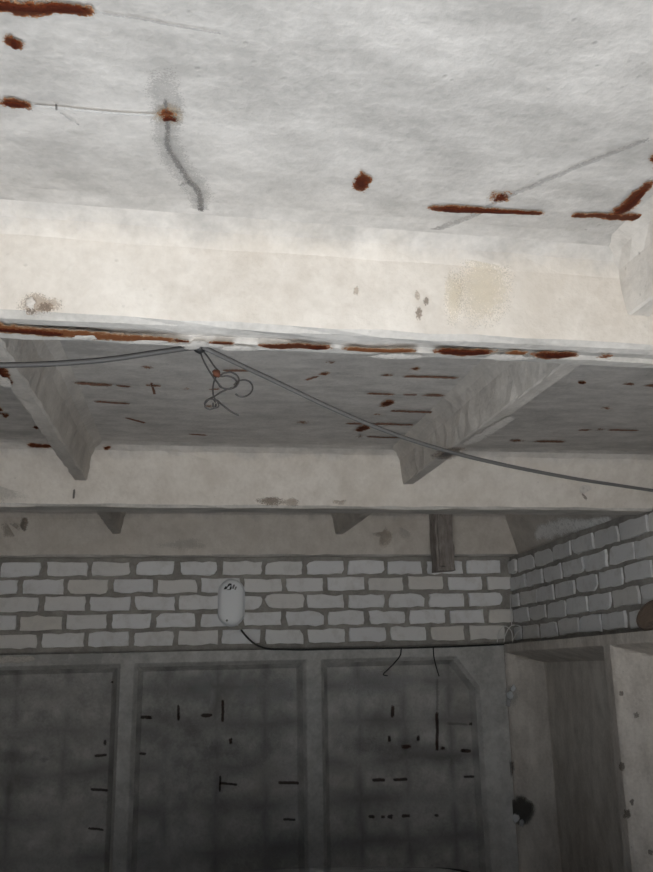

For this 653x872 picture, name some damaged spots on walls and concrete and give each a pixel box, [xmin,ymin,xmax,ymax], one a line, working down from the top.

rust [0,0,95,19]
rust [2,35,23,51]
rust [0,97,33,111]
rust [152,103,184,126]
rust [352,171,373,192]
rust [426,191,543,215]
rust [571,181,653,221]
rust [0,322,581,379]
rust [346,393,446,438]